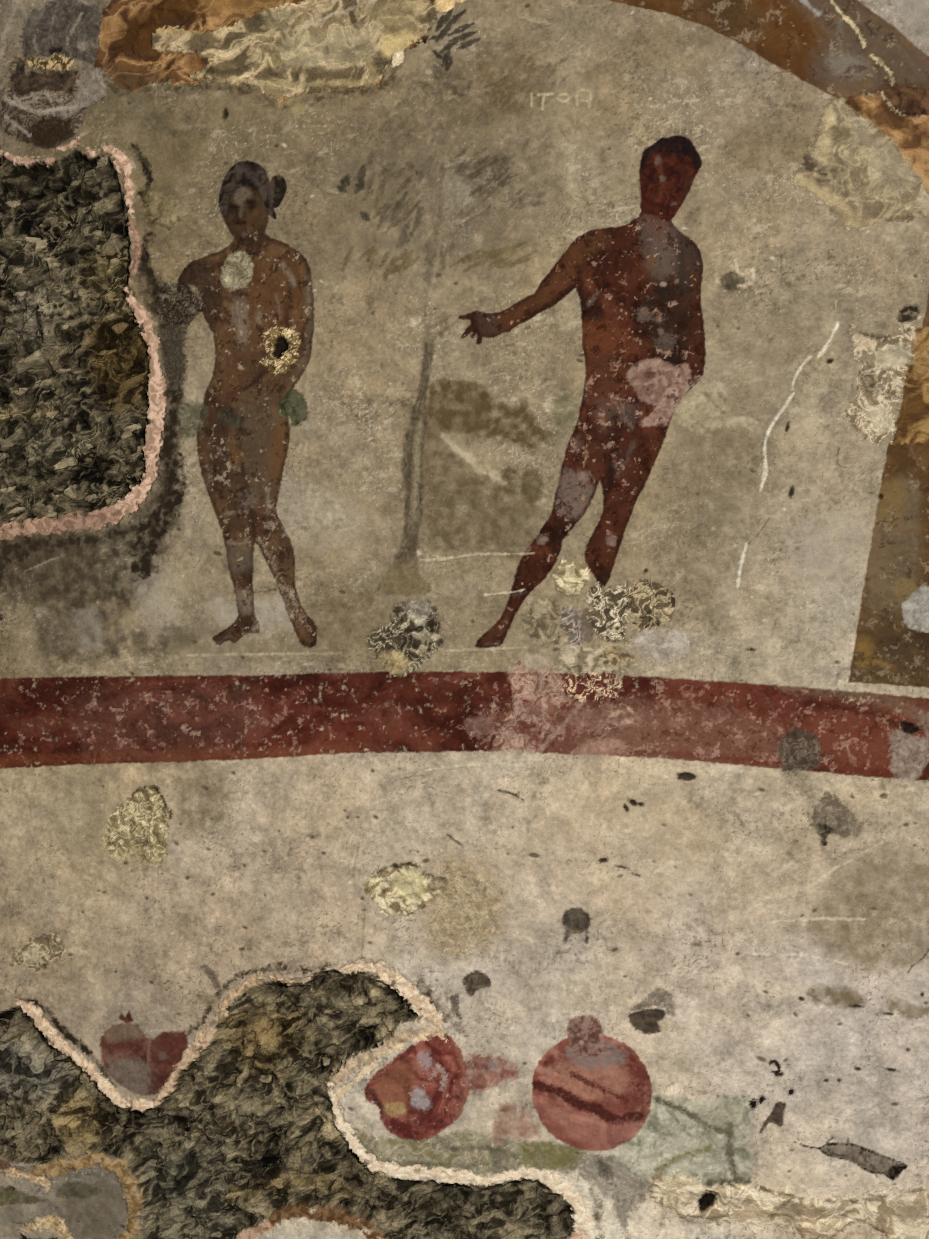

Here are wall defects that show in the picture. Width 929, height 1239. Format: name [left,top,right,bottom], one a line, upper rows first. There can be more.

flaking render [97,0,467,103]
flaking render [792,84,929,232]
flaking render [0,136,168,541]
hole [258,325,303,377]
crack [735,319,841,590]
flaking render [835,304,929,471]
flaking render [364,598,446,679]
flaking render [519,557,699,705]
flaking render [100,783,174,865]
flaking render [0,853,597,1239]